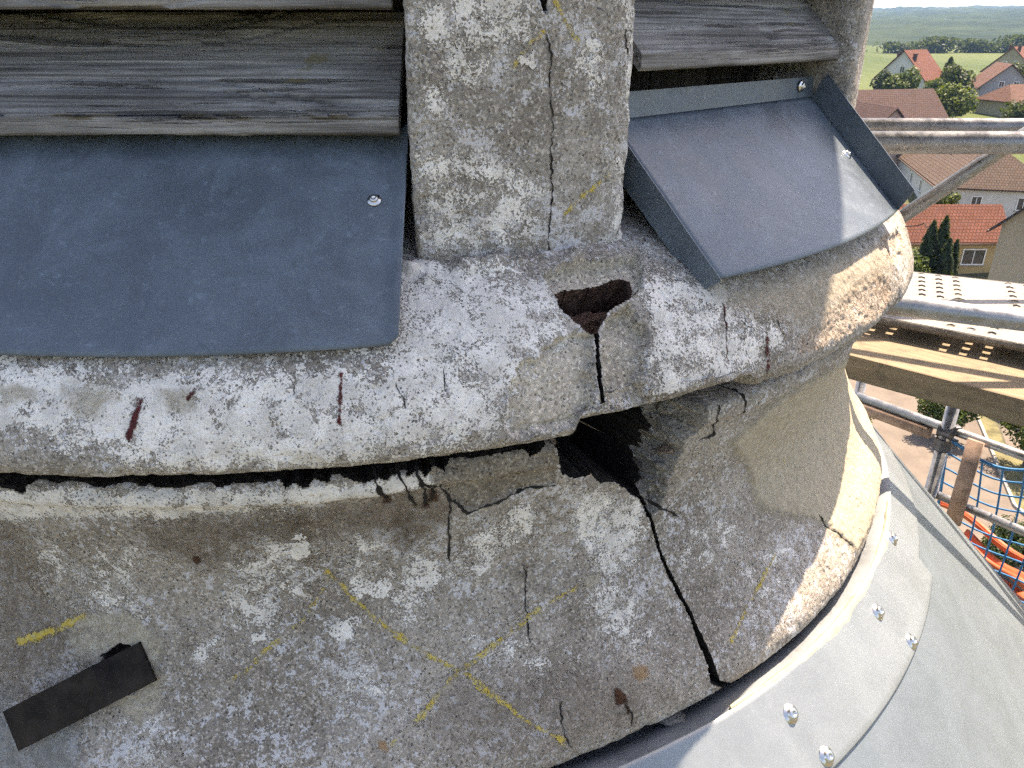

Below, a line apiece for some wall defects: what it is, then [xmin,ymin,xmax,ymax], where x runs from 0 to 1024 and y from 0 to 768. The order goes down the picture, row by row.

crack [546,34,554,250]
peeling [0,130,904,684]
crack [371,459,556,561]
crack [523,565,531,643]
crack [594,333,605,408]
crack [617,479,726,687]